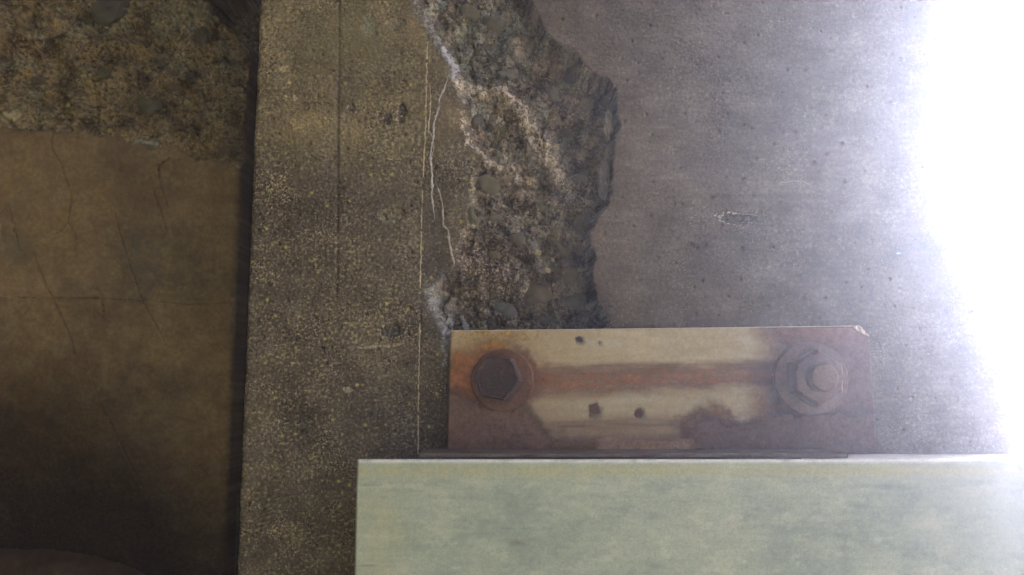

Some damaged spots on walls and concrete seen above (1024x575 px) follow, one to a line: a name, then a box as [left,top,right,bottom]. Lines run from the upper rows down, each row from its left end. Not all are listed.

crack [419,27,455,288]
spalling [418,0,622,353]
crack [415,324,423,454]
rust [448,331,774,449]
rust [680,404,877,453]